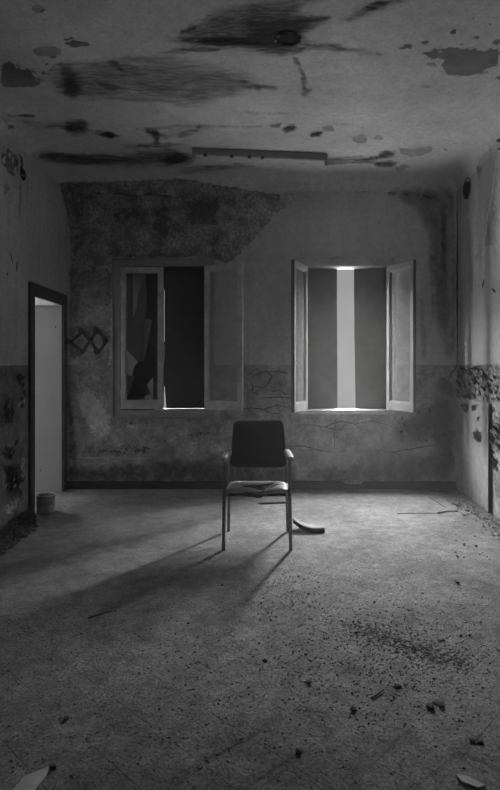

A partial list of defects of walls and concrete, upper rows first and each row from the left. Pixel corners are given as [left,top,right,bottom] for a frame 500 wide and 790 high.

peeling [1,37,90,88]
water stain [58,20,311,102]
peeling [399,36,500,80]
peeling [1,146,26,181]
water stain [48,121,88,133]
water stain [40,126,206,168]
peeling [58,178,307,466]
peeling [456,364,500,498]